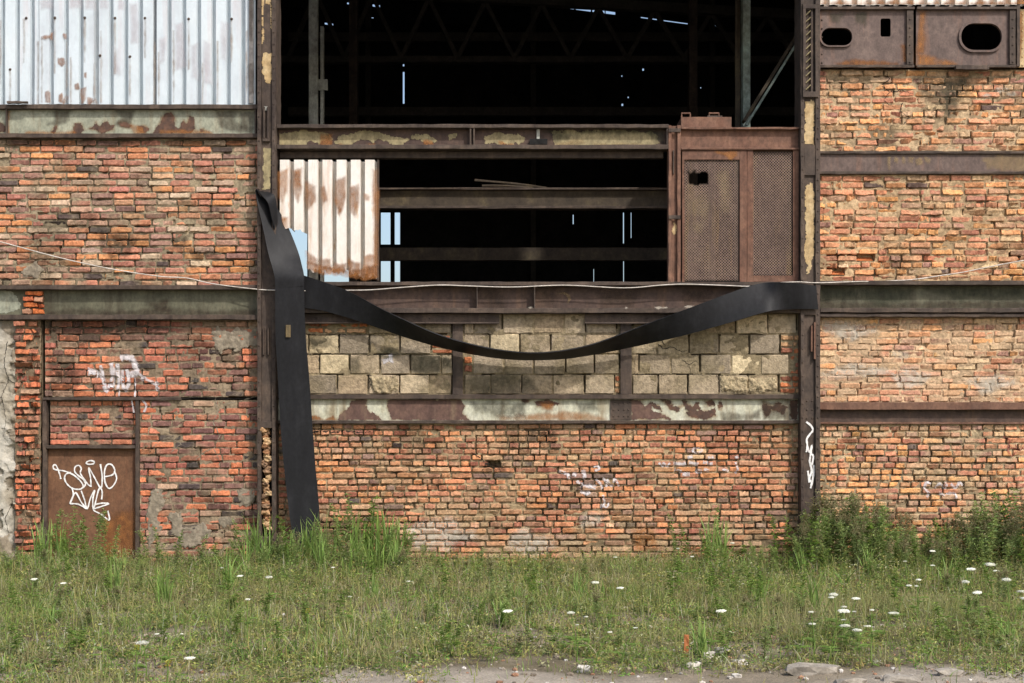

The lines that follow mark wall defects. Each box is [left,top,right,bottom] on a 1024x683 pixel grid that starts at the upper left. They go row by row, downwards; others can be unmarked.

corrosion [902,1,952,65]
peeling [73,112,203,134]
peeling [484,132,525,145]
peeling [552,130,659,145]
peeling [804,99,815,145]
corrosion [279,170,358,213]
peeling [804,183,815,274]
corrosion [307,232,377,280]